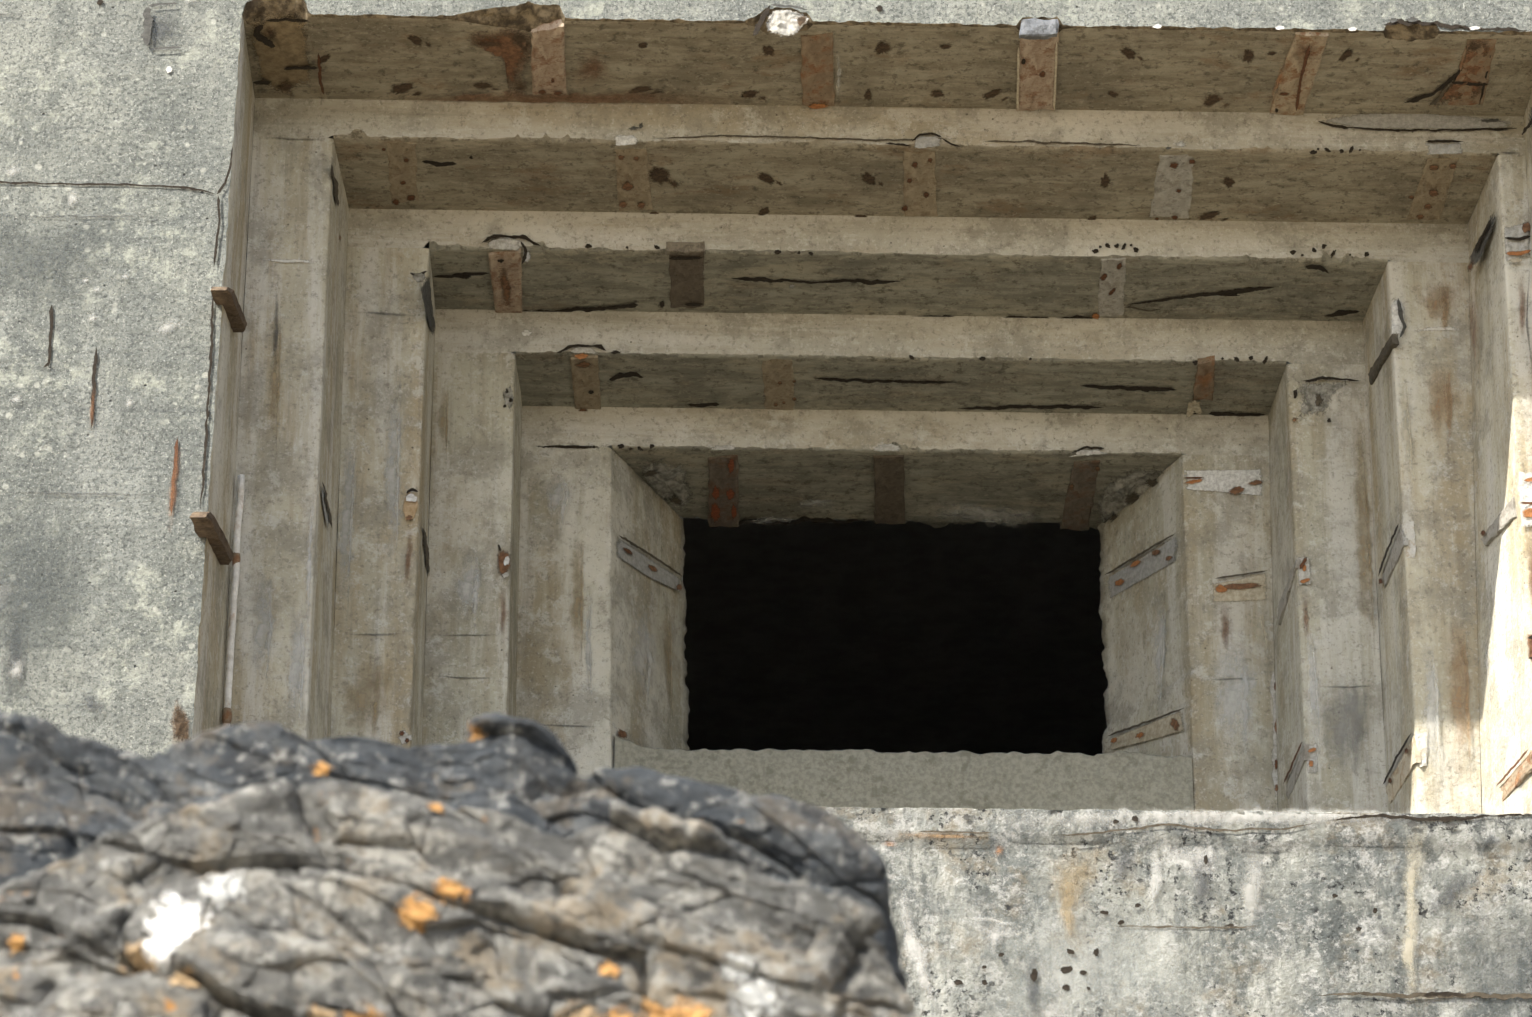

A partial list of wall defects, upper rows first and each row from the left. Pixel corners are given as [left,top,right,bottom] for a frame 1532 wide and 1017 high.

spalling [753,4,809,56]
crack [0,146,233,510]
crack [732,277,900,289]
crack [1003,265,1329,320]
crack [1325,309,1360,317]
corrosion [90,346,98,428]
corrosion [170,438,178,515]